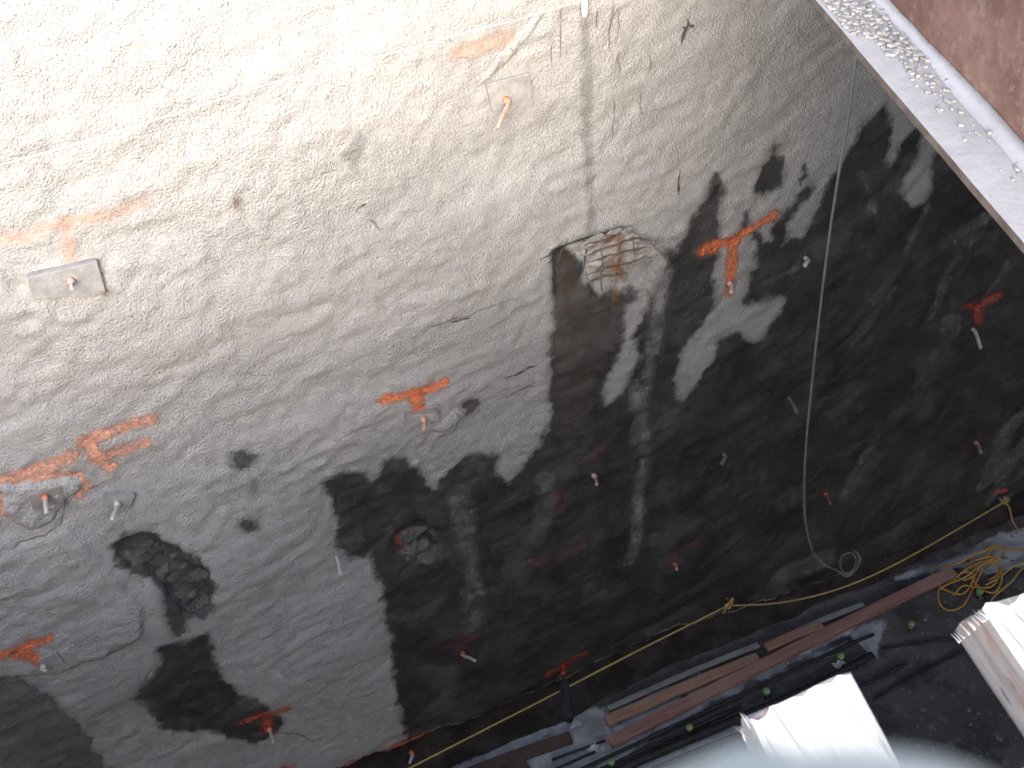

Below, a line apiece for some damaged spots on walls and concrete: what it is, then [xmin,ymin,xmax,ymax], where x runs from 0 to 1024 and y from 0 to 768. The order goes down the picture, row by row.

spalling [578,227,662,298]
damp [323,107,1024,740]
spalling [111,533,210,613]
spalling [392,520,439,561]
damp [114,532,283,744]
damp [0,676,104,768]